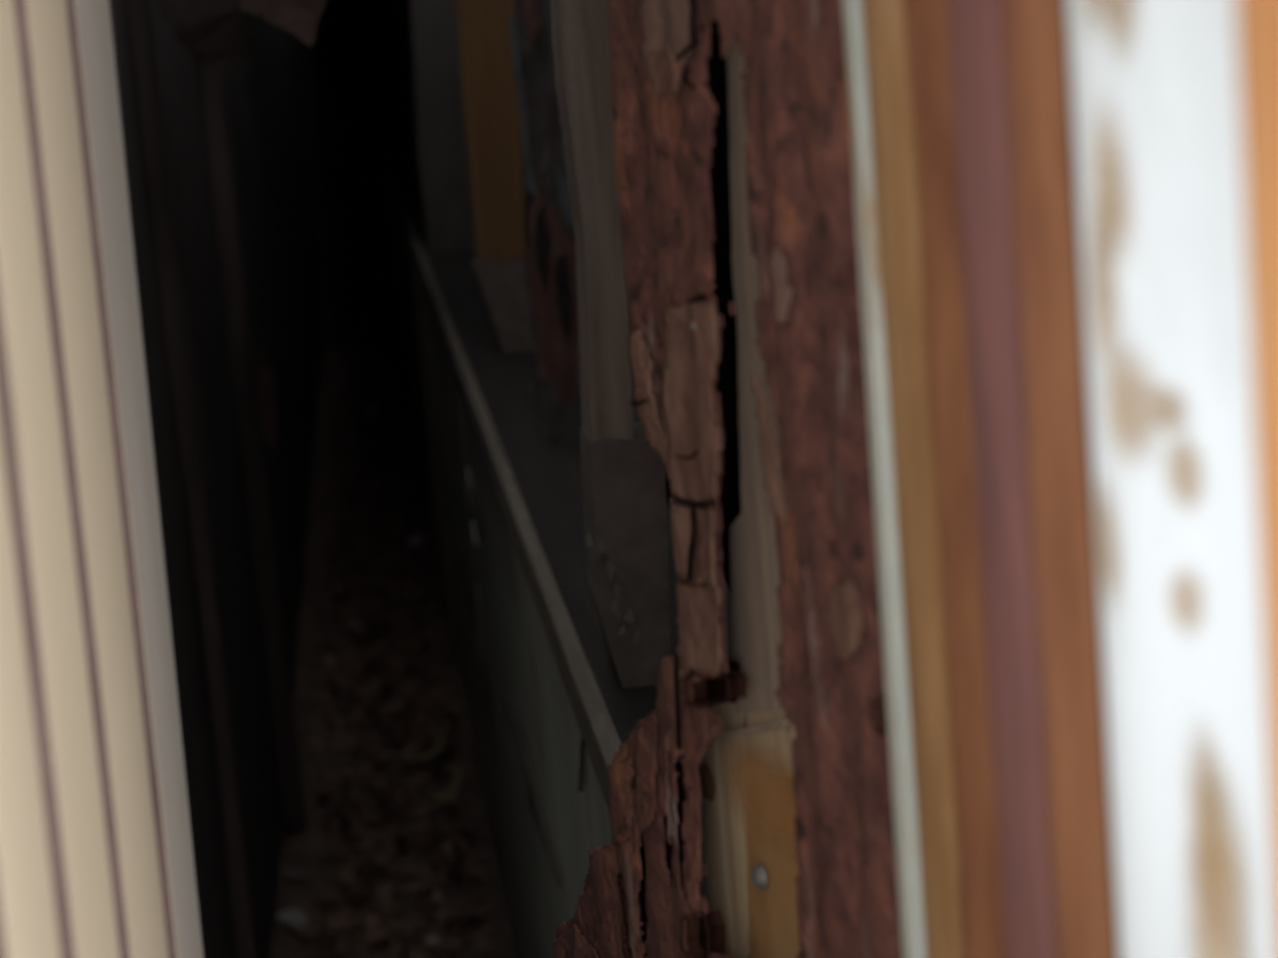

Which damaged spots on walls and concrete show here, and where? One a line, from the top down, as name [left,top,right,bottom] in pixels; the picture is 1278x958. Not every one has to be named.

crack [673,0,705,89]
crack [686,293,708,303]
spalling [705,20,741,589]
crack [667,494,710,581]